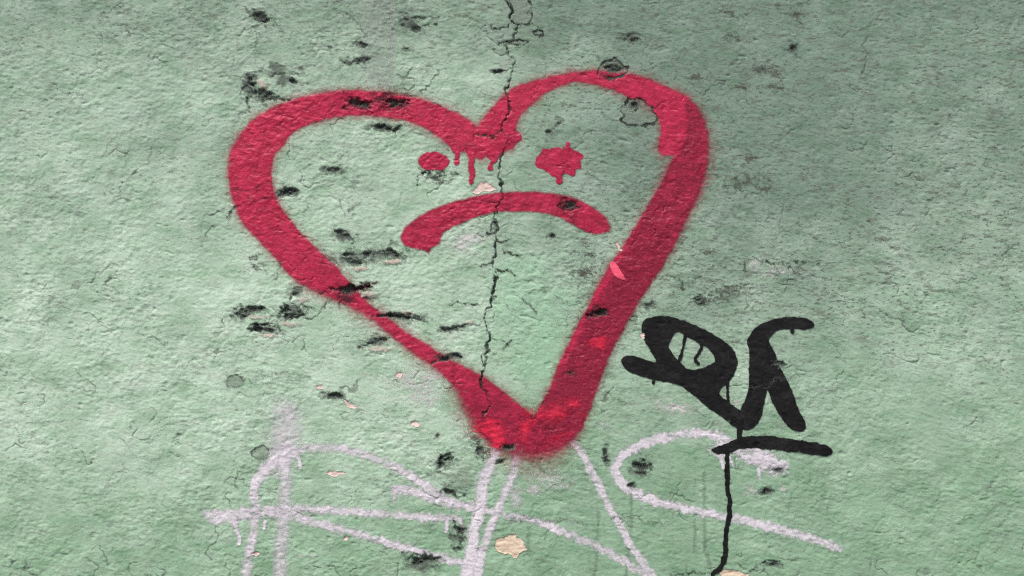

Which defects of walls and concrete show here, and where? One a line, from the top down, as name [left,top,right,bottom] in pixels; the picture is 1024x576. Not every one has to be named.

flaking render [473,182,496,194]
crack [450,2,563,415]
flaking render [495,534,527,558]